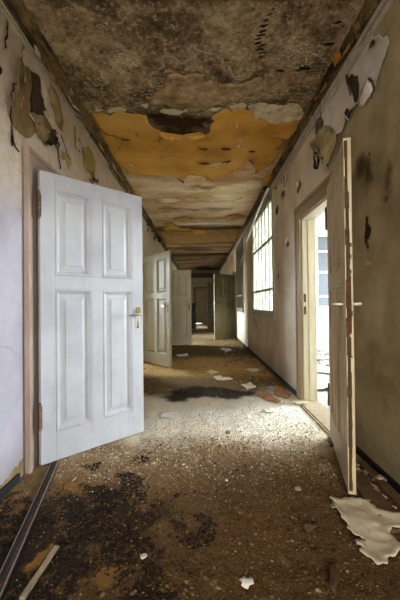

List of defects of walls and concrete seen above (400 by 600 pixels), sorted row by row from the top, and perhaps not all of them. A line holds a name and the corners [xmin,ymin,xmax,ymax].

peeling [12,57,61,149]
water stain [141,103,247,116]
peeling [91,73,304,192]
water stain [148,44,252,95]
peeling [315,32,389,134]